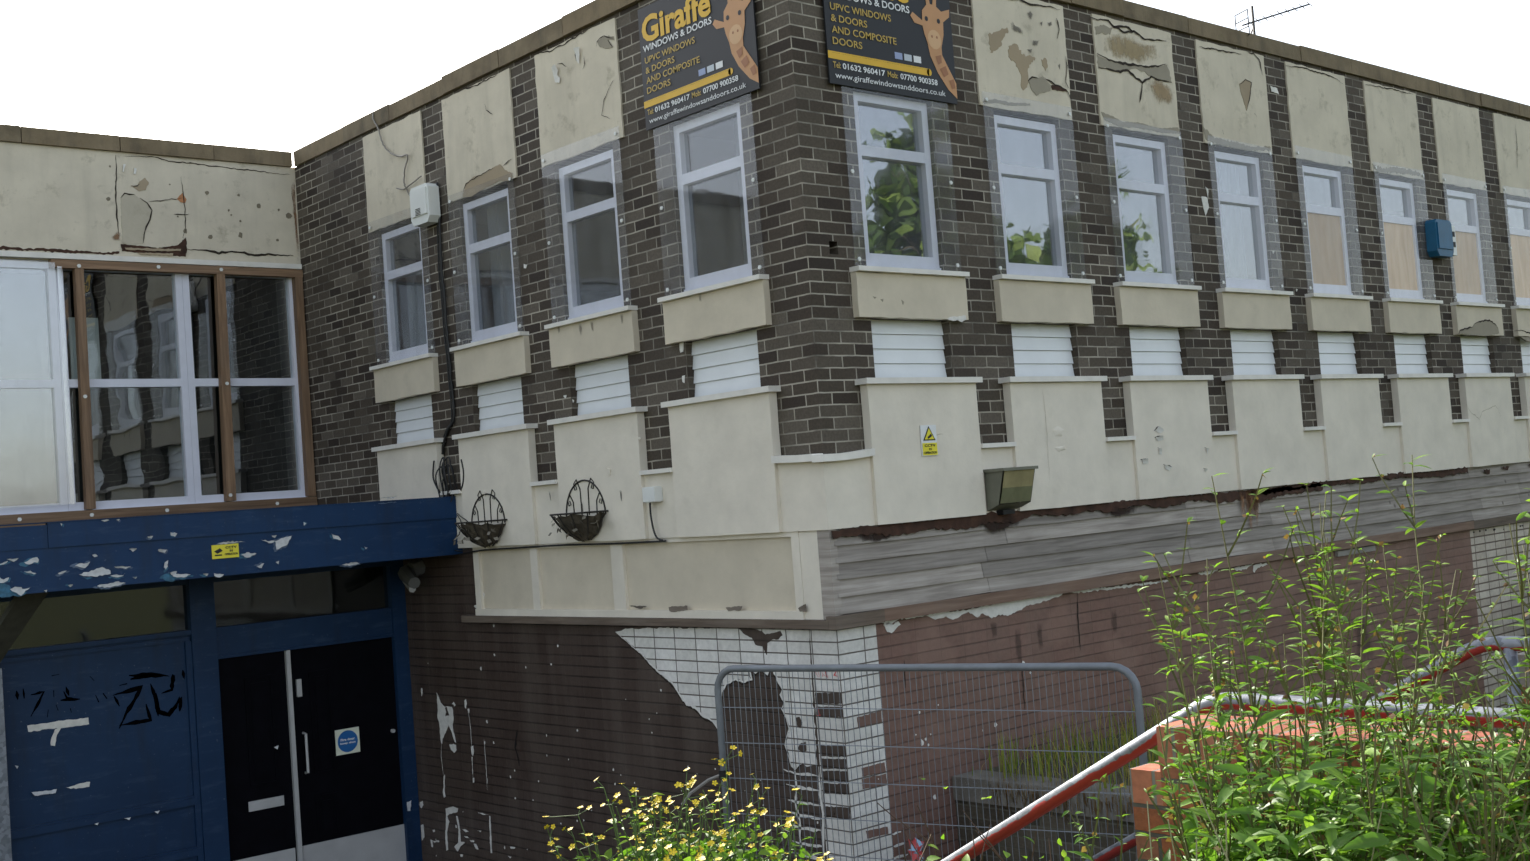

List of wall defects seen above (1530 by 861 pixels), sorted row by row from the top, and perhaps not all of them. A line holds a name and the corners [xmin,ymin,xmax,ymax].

flaking render [983,28,1066,106]
spalling [1097,55,1171,82]
crack [1021,0,1411,123]
spalling [1239,79,1252,111]
crack [115,156,293,256]
spalling [463,159,513,198]
peeling [0,532,224,596]
peeling [213,522,307,568]
peeling [615,604,853,861]
peeling [32,782,90,796]
peeling [407,688,528,858]